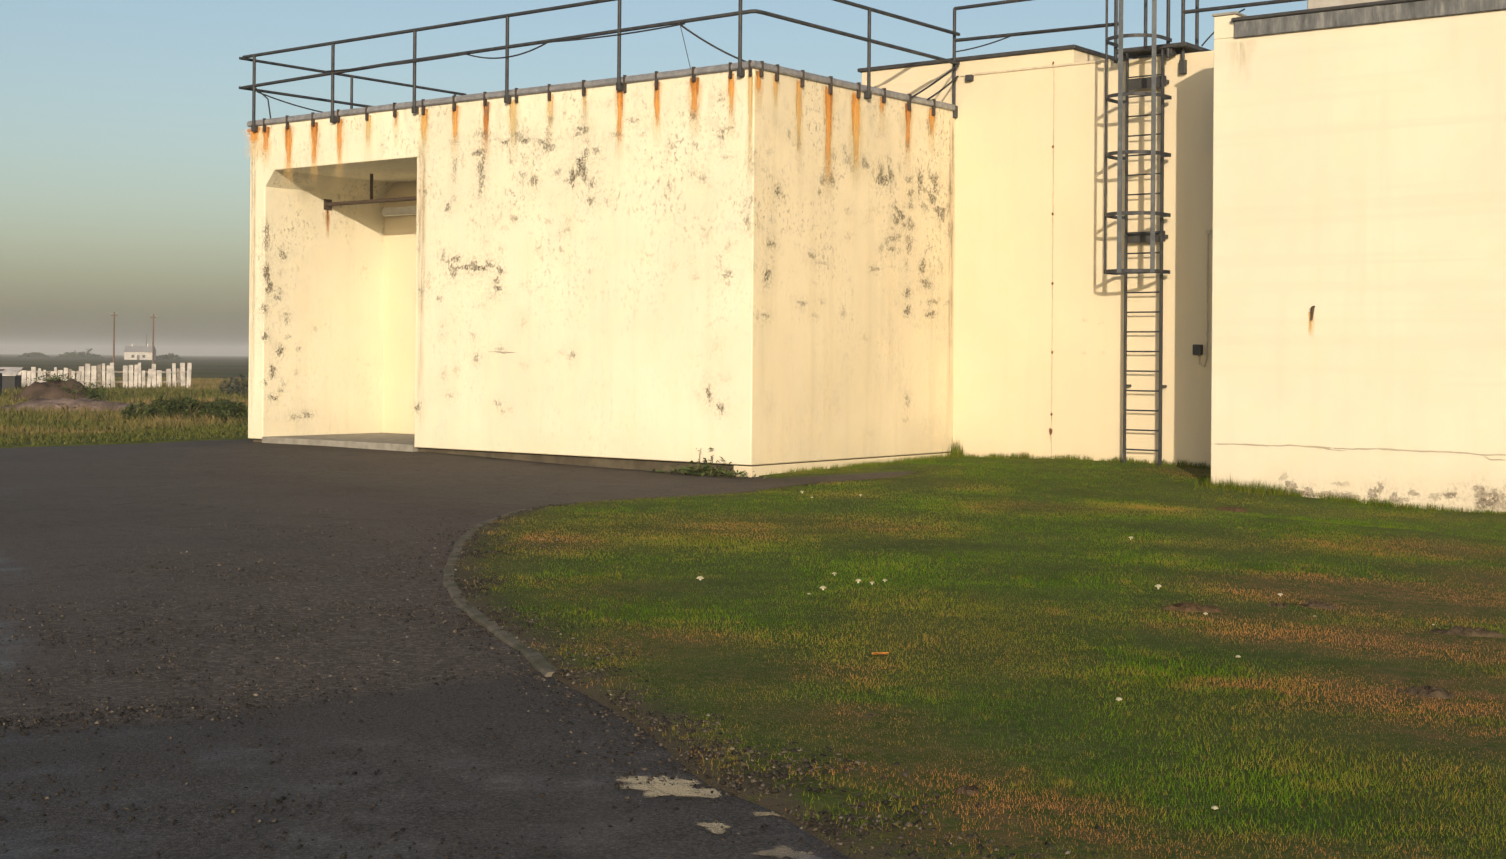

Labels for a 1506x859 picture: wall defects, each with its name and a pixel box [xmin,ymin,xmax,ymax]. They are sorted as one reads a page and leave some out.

corrosion [690,78,699,111]
corrosion [729,71,777,132]
corrosion [852,94,860,154]
crack [1219,444,1502,460]